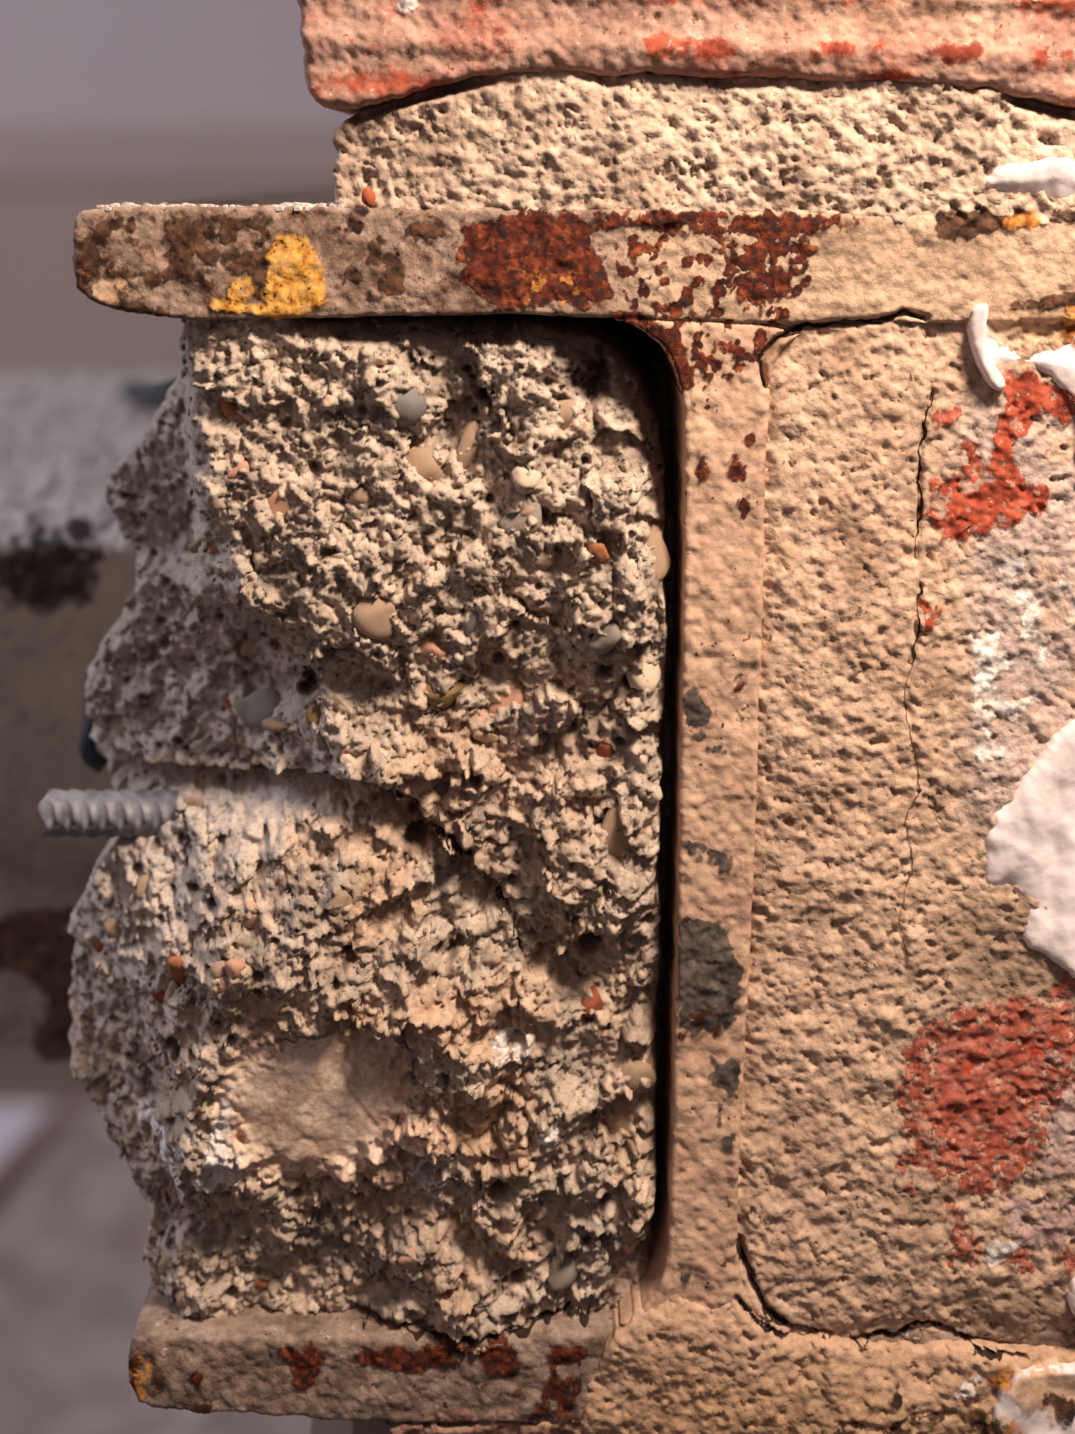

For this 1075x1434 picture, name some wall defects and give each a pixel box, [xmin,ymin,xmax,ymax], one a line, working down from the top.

rust [103,298,185,317]
rust [75,214,273,301]
rust [330,207,860,406]
rust [728,432,756,519]
peeling [919,303,1075,542]
crack [899,391,942,969]
peeling [916,598,942,632]
spalling [0,231,745,1355]
crack [316,771,531,952]
peeling [892,973,1075,1274]
rust [353,1332,588,1428]
crack [736,1241,1019,1362]